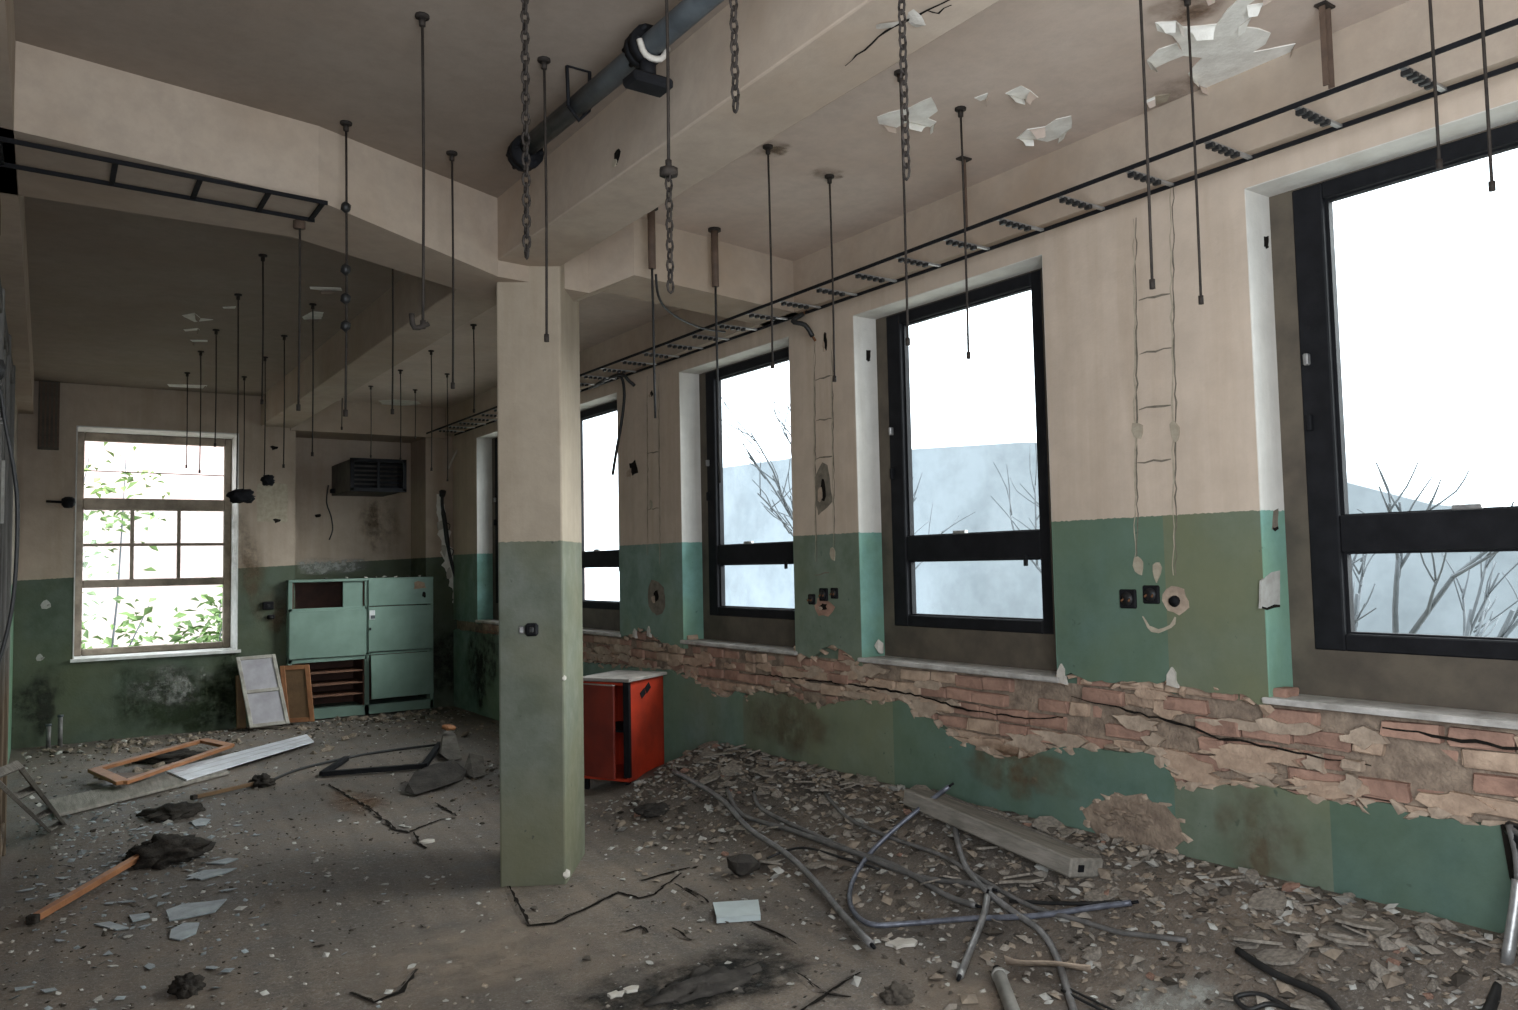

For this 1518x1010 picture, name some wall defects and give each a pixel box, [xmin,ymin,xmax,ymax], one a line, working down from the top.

peeling [1147,0,1296,95]
peeling [877,97,938,134]
peeling [1016,116,1072,146]
leakage [117,653,239,730]
flaking render [583,580,1518,855]